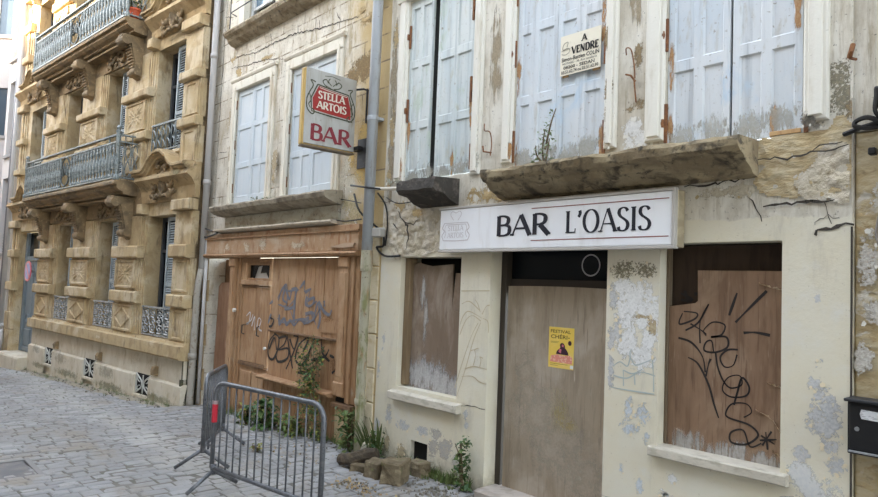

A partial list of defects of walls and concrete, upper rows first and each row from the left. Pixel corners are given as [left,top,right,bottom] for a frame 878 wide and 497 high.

corrosion [794,0,803,28]
flaking render [695,115,852,204]
flaking render [383,201,441,260]
peeling [855,228,878,332]
peeling [607,277,659,389]
peeling [853,340,875,377]
peeling [374,404,459,472]
peeling [782,359,848,497]